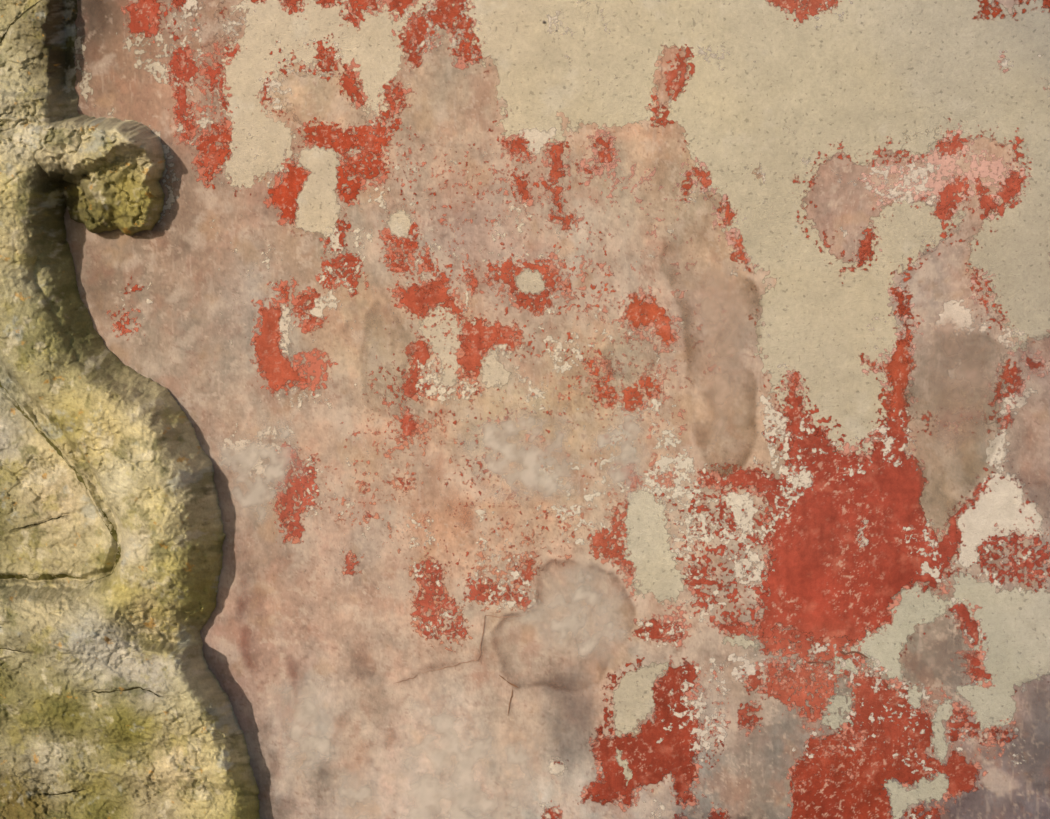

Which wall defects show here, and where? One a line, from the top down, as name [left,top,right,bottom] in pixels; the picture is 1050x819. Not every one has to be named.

spalling [75,27,93,101]
peeling [448,408,518,448]
peeling [219,420,423,544]
peeling [438,447,529,522]
peeling [339,550,363,575]
crack [396,615,523,683]
peeling [406,518,548,652]
leakage [550,574,613,655]
peeling [581,656,731,819]
peeling [737,700,763,736]
peeling [539,800,563,819]